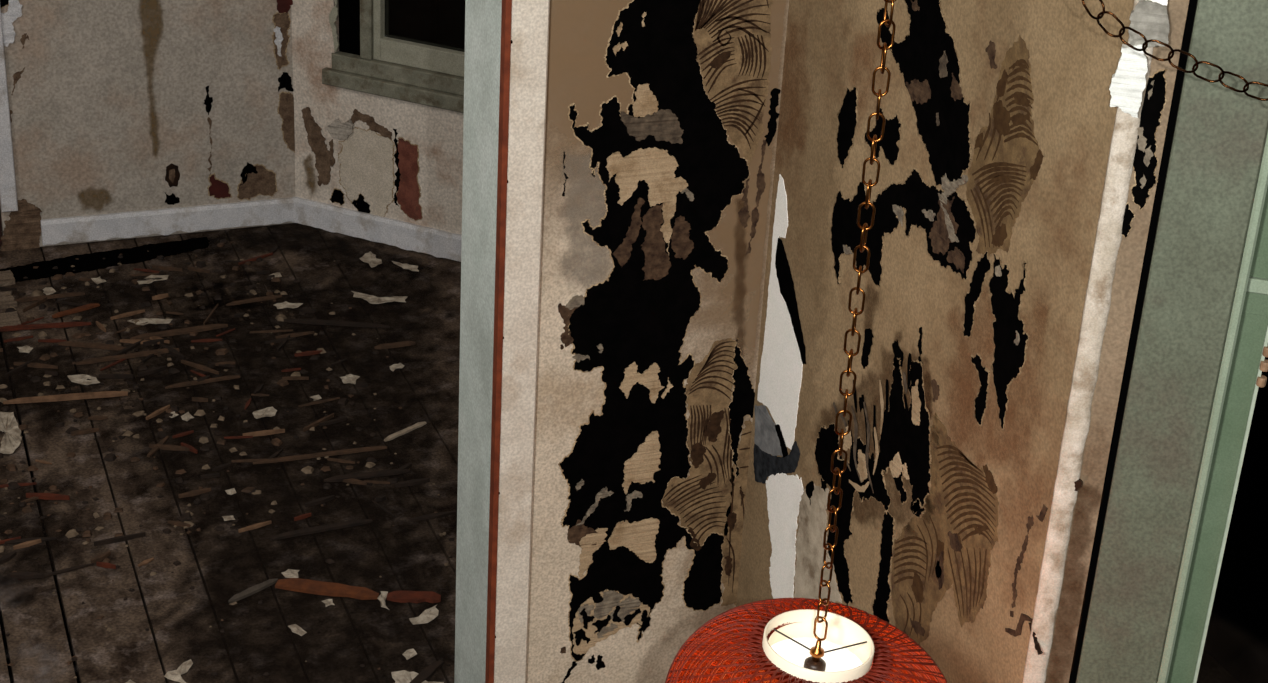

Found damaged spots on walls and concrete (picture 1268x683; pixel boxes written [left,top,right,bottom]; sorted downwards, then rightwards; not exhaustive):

leakage [140,0,163,156]
spalling [272,0,295,153]
peeling [1109,0,1170,188]
spalling [329,188,370,213]
peeling [606,83,694,281]
peeling [922,173,968,273]
peeling [558,295,603,363]
peeling [619,361,673,403]
flaking render [753,174,842,603]
peeling [567,431,661,579]
peeling [889,452,909,480]
peeling [572,589,650,655]